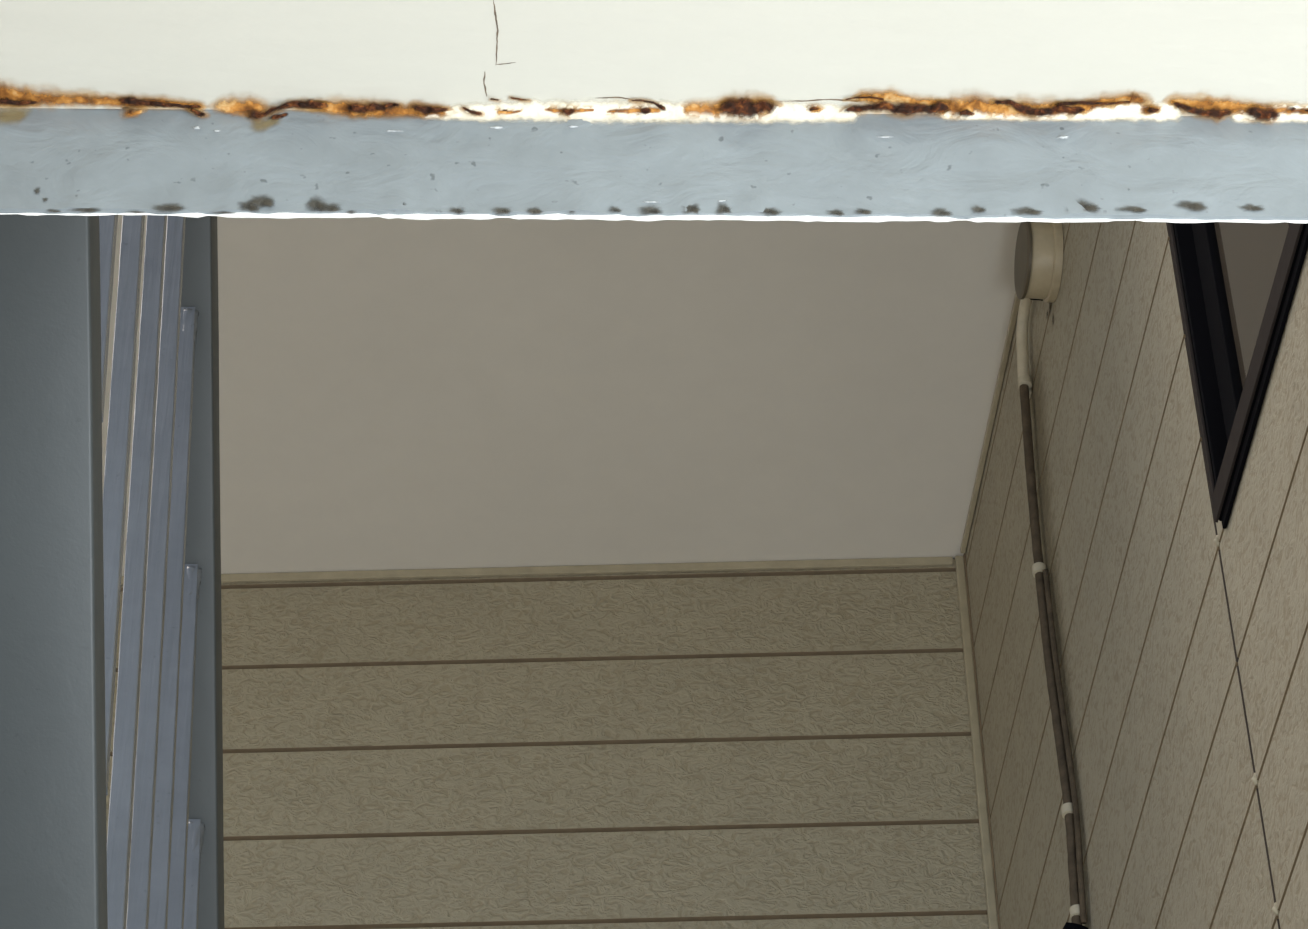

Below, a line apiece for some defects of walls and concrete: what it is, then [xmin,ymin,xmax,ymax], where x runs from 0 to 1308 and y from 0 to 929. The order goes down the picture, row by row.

crack [483,0,515,97]
corrosion [0,86,482,129]
corrosion [491,97,526,114]
corrosion [545,99,666,116]
peeling [422,100,857,129]
corrosion [684,98,777,118]
corrosion [845,92,1308,121]